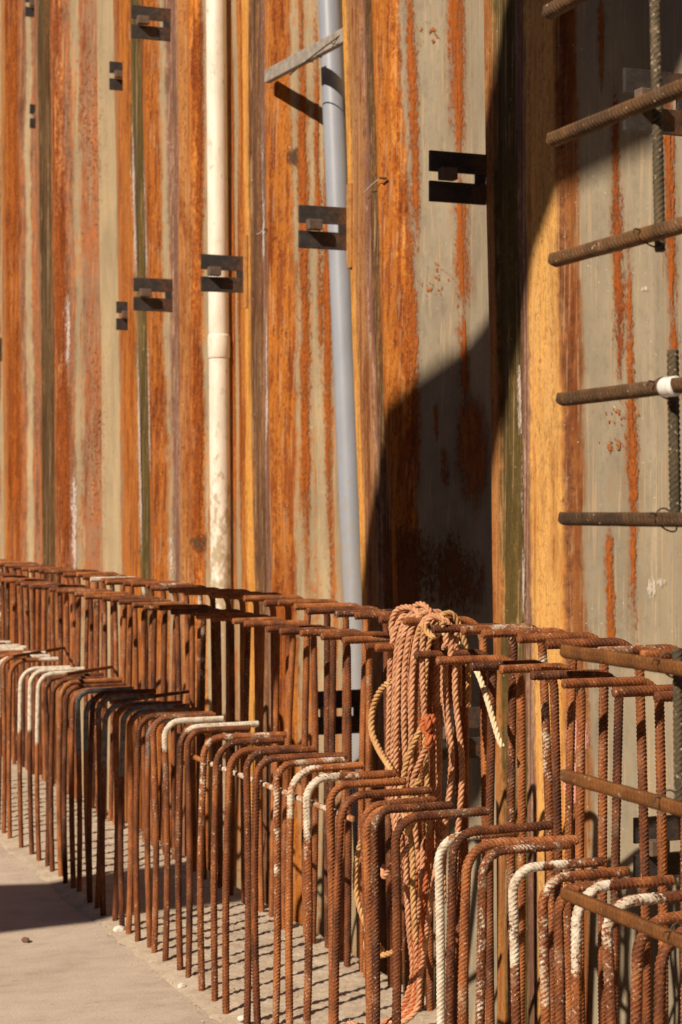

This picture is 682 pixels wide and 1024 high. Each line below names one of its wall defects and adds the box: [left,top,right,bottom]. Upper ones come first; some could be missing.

rust [193,13,206,259]
rust [296,59,326,206]
rust [401,0,476,493]
rust [607,122,624,235]
rust [611,249,635,384]
rust [663,135,677,221]
rust [662,236,681,359]
rust [56,312,111,561]
rust [192,334,204,552]
rust [296,245,334,597]
rust [592,399,640,512]
rust [603,527,638,641]